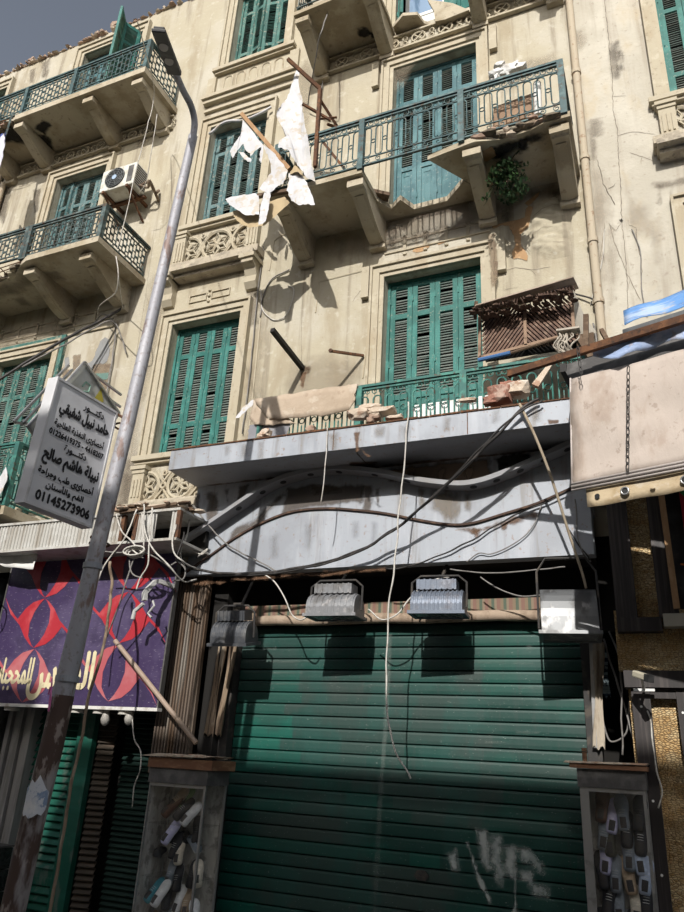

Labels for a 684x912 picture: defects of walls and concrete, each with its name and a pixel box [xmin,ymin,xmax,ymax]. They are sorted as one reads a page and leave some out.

peeling [393,0,470,35]
spalling [470,112,561,161]
water stain [492,134,545,159]
crack [596,0,650,309]
peeling [488,193,539,286]
peeling [61,338,111,389]